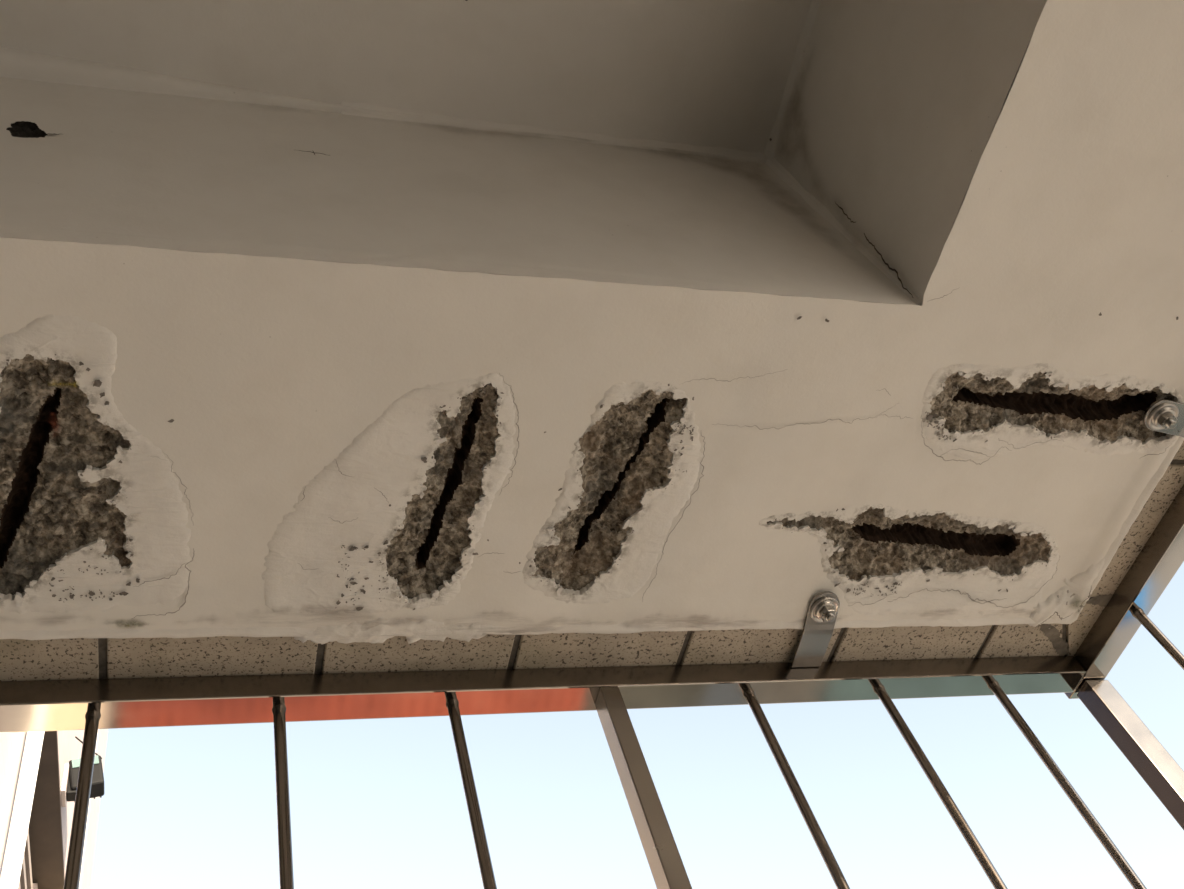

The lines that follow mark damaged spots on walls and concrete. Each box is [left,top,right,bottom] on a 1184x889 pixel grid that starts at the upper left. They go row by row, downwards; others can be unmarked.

spalling [0,314,191,614]